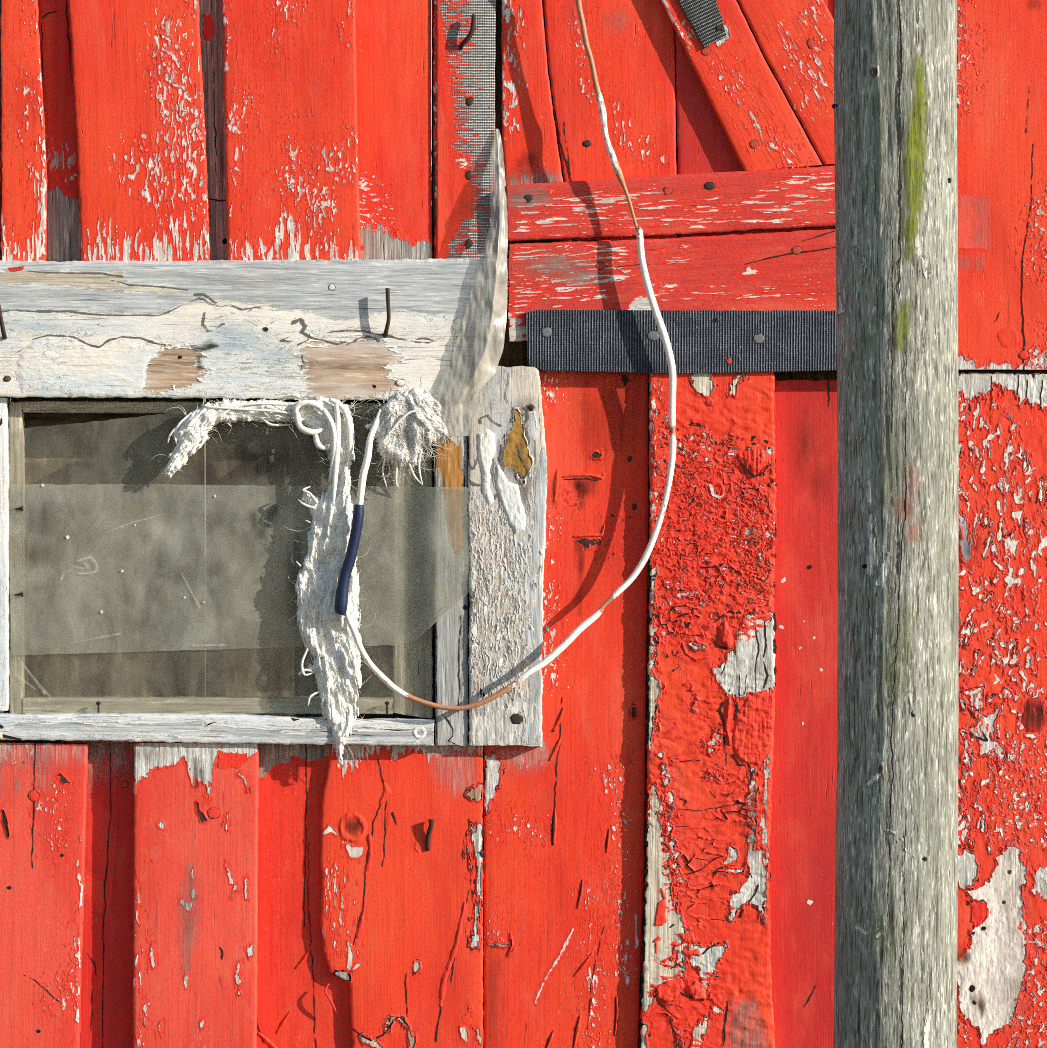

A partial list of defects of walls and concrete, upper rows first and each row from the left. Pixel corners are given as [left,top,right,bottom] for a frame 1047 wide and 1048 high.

crack [2,271,263,354]
peeling [0,0,490,401]
crack [281,318,437,370]
peeling [957,0,1000,146]
peeling [0,371,786,1048]
crack [643,452,776,1048]
peeling [957,163,1047,1048]